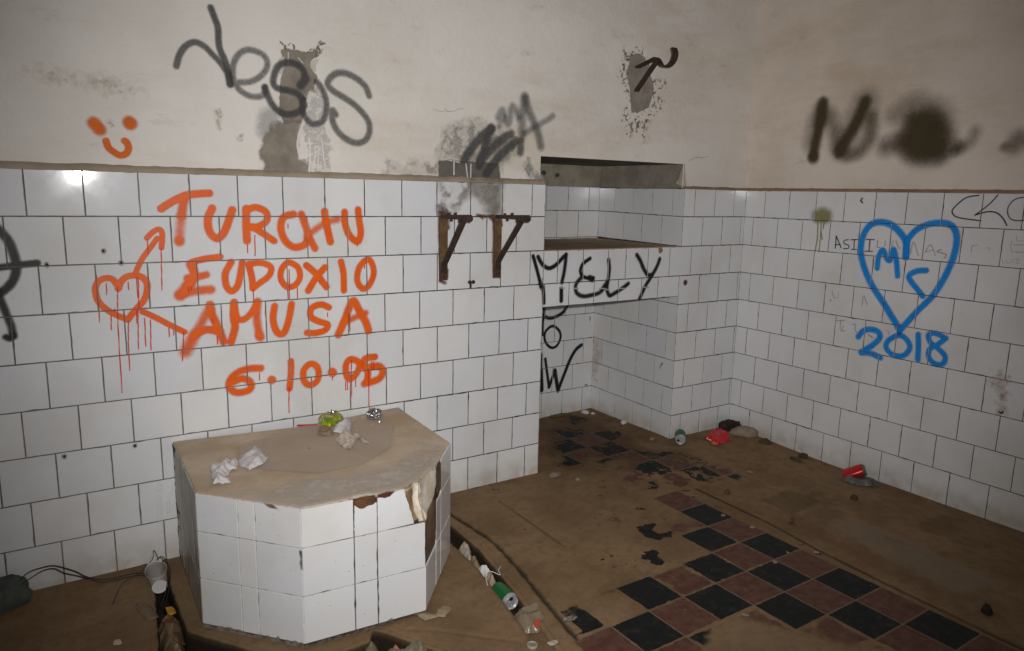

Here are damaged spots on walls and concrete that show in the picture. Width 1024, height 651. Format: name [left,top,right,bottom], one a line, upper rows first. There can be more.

peeling [260,41,325,172]
flaking render [620,47,666,143]
spalling [353,461,441,564]